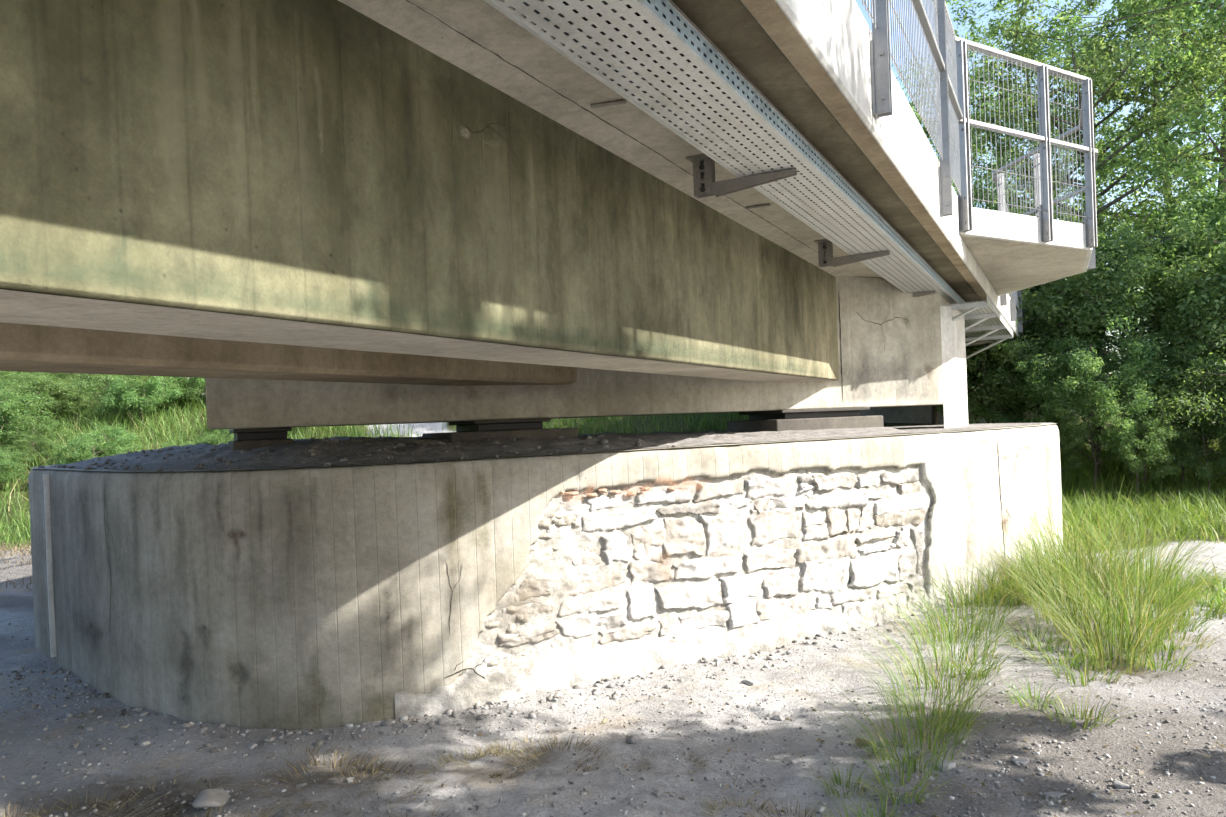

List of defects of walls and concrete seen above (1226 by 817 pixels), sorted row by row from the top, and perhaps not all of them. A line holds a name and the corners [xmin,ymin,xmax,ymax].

crack [839,301,907,397]
crack [445,561,462,633]
spalling [394,465,954,719]
crack [445,659,486,680]